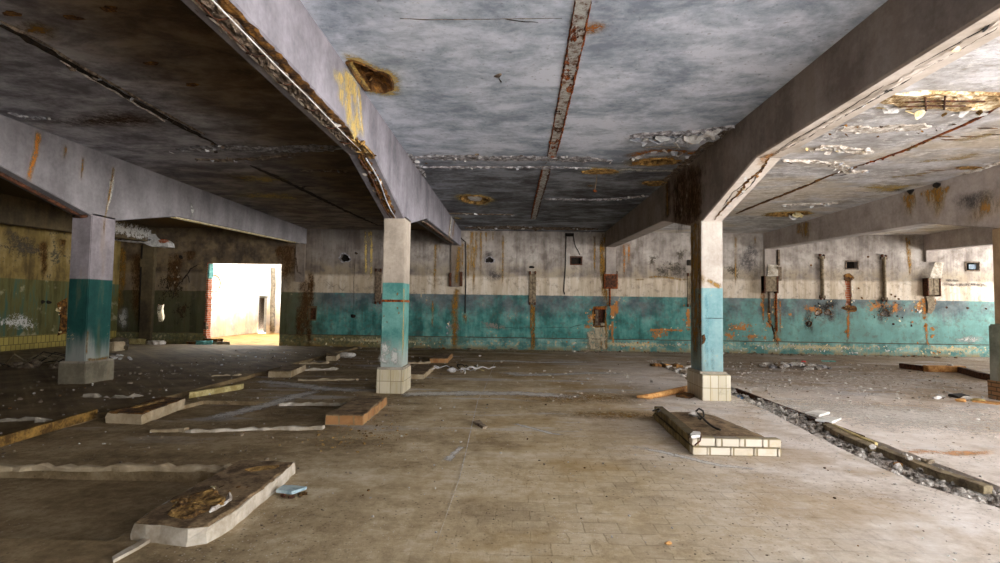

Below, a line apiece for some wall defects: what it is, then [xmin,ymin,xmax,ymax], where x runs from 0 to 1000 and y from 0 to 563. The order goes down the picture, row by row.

rust [28,133,41,179]
crack [0,20,221,148]
spalling [195,0,399,218]
leakage [334,71,377,159]
rust [531,0,603,219]
peeling [616,128,722,179]
crack [714,27,998,220]
spalling [779,19,1000,173]
leakage [0,313,37,330]
rust [451,244,466,346]
leakage [636,168,701,354]
spalling [803,273,923,327]